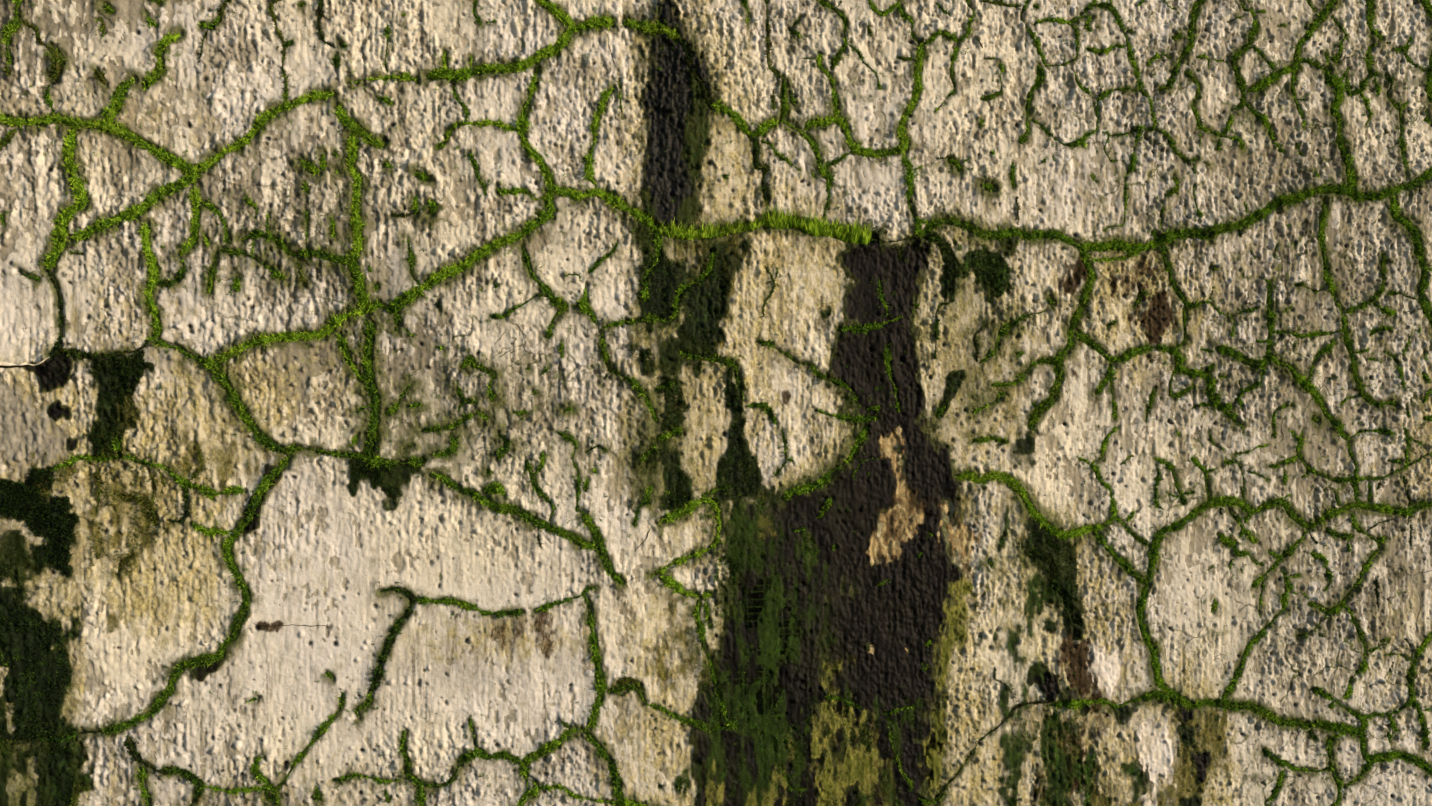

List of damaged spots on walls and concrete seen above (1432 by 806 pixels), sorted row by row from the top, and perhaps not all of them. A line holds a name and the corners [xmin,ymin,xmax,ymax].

crack [819,0,883,90]
crack [980,0,1205,231]
crack [1184,0,1285,153]
crack [50,436,245,527]
crack [429,431,638,585]
crack [489,240,716,422]
crack [679,277,920,532]
water stain [622,0,1173,806]
crack [918,196,1432,806]
water stain [0,465,94,806]
crack [124,691,347,806]
crack [330,484,737,806]